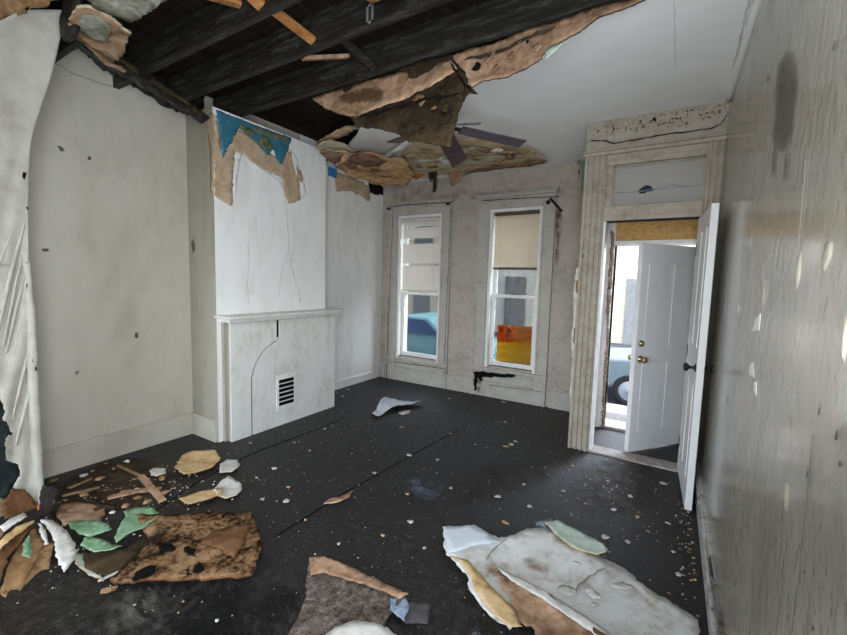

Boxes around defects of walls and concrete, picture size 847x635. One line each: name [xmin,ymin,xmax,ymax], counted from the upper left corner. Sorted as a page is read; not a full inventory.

flaking render [0,0,53,20]
peeling [87,0,166,23]
damp [775,67,793,138]
peeling [204,110,306,206]
peeling [328,166,383,202]
peeling [401,137,548,186]